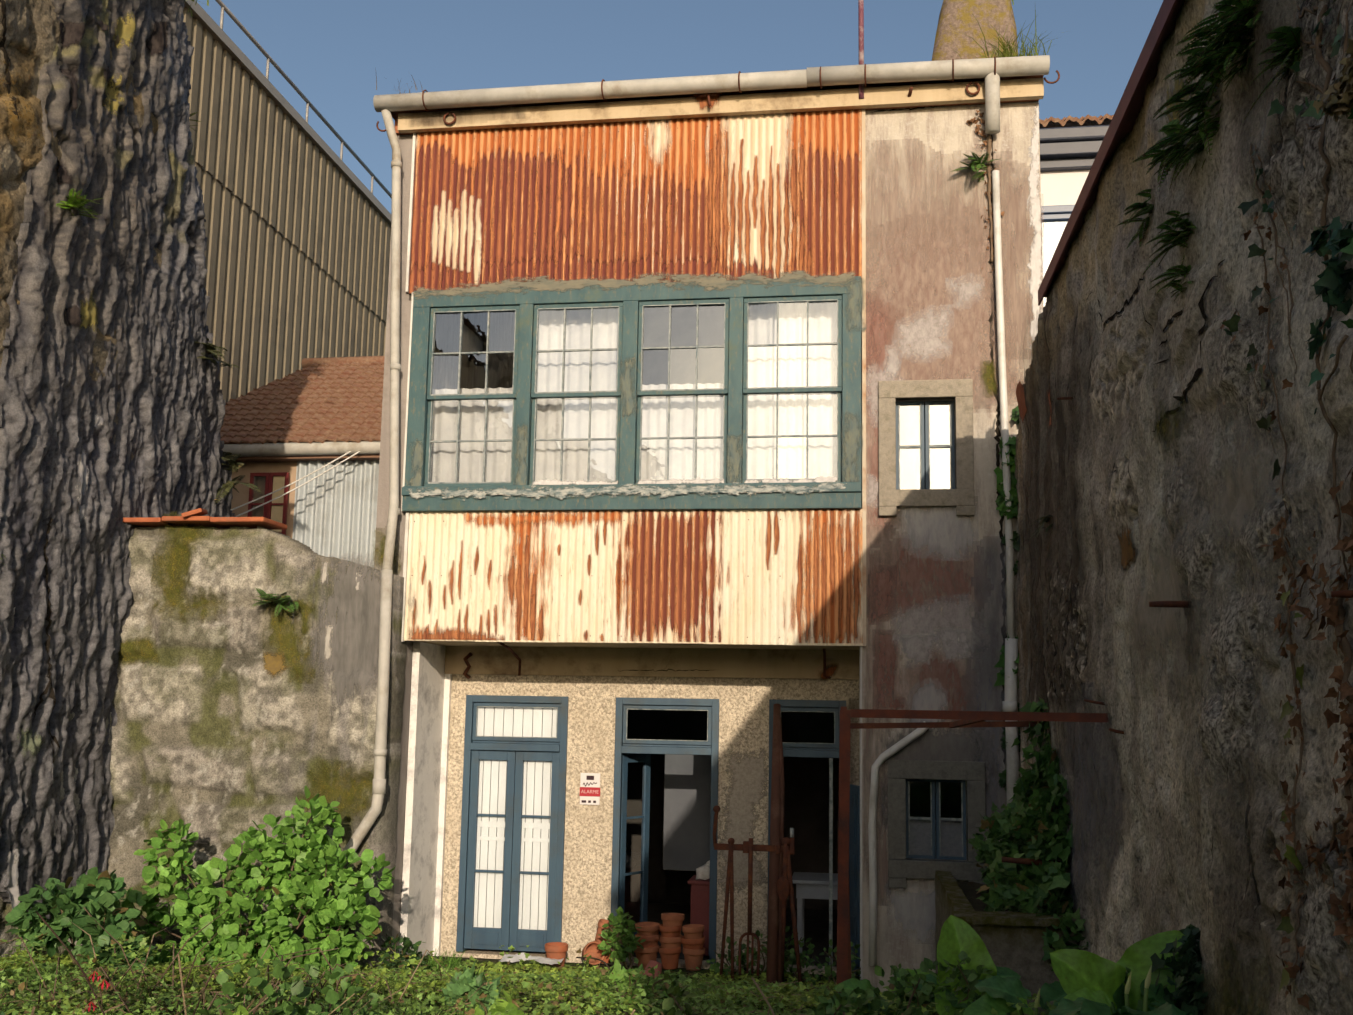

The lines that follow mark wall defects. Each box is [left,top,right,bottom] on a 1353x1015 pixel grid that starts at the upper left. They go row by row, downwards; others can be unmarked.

rust [409,92,862,294]
water stain [866,311,948,418]
crack [1087,259,1225,432]
crack [33,513,60,764]
water stain [302,553,414,732]
rust [409,510,730,642]
rust [766,510,779,570]
rust [784,509,863,643]